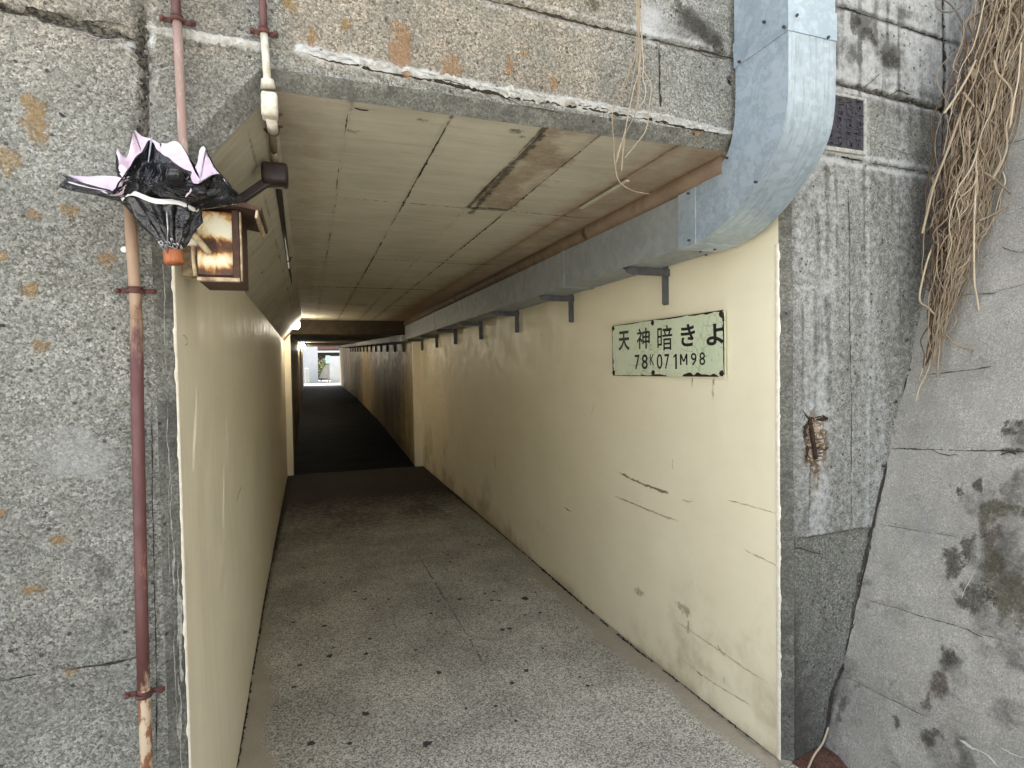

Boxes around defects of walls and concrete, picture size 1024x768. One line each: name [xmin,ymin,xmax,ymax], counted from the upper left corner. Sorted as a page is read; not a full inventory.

corrosion [388,22,411,79]
crack [306,0,733,138]
water stain [850,12,899,67]
water stain [469,129,545,213]
crack [846,284,854,466]
crack [894,294,991,403]
crack [795,448,1024,749]
water stain [944,478,1024,629]
water stain [921,647,957,709]
water stain [920,728,940,746]